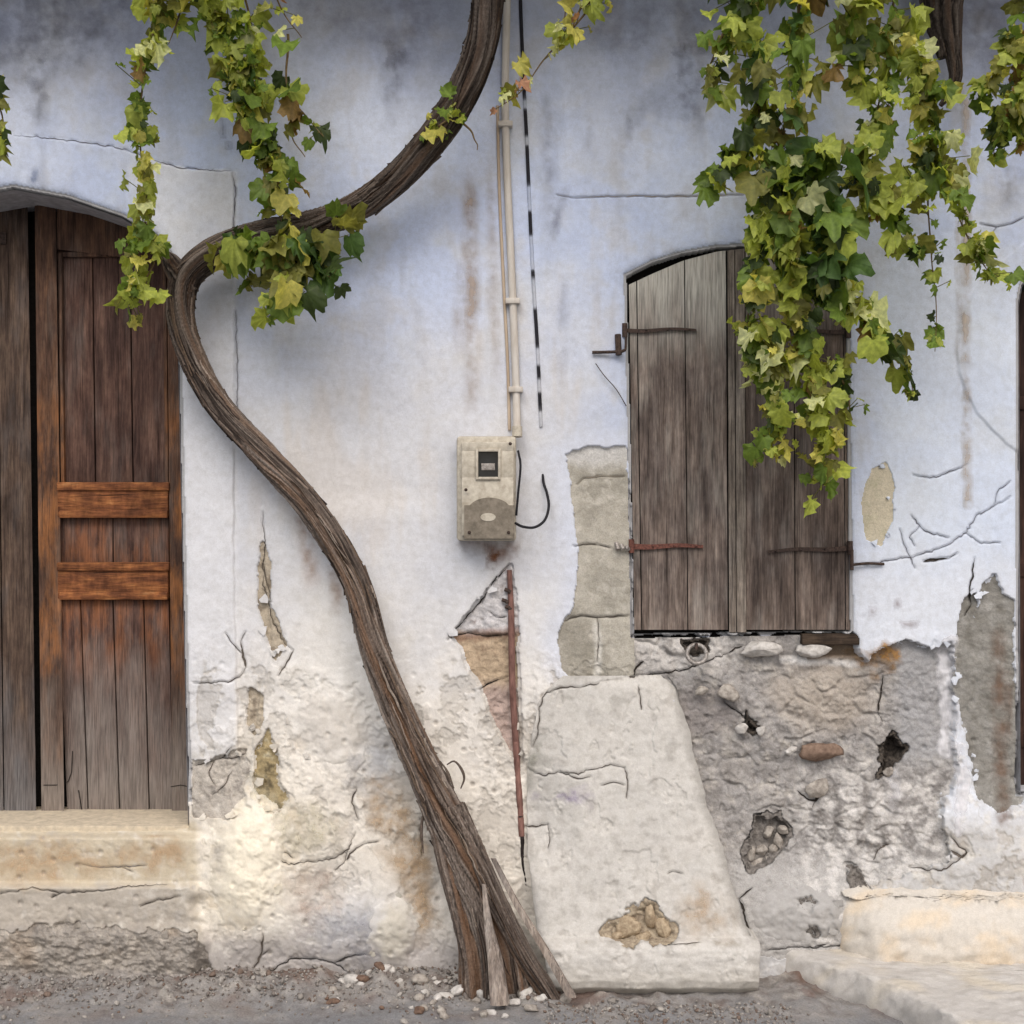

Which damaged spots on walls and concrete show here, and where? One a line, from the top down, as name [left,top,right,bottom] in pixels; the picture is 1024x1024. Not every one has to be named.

crack [560,192,744,200]
flaking render [192,687,288,820]
flaking render [258,541,287,660]
flaking render [447,563,523,756]
crack [532,682,628,797]
flaking render [557,446,1024,960]
corrosion [861,643,900,667]
crack [881,482,1009,616]
crack [5,864,179,906]
crack [283,789,379,869]